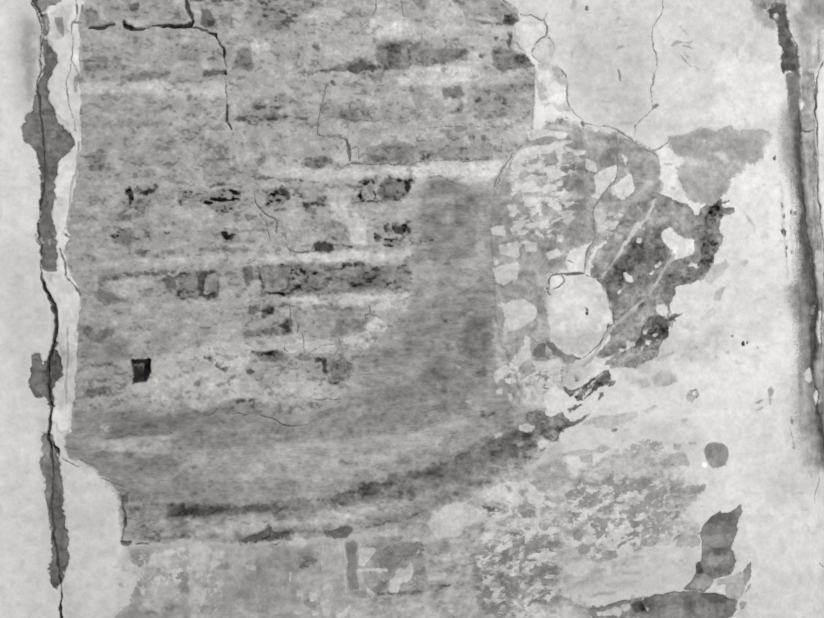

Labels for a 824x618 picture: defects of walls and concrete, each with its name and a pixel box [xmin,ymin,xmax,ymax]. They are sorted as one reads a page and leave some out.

crack [65,0,232,132]
crack [503,0,555,65]
leakage [749,0,777,32]
flaking render [21,39,75,273]
crack [30,0,156,618]
peeling [490,275,581,414]
crack [546,0,669,357]
leakage [613,338,678,390]
peeling [582,125,773,371]
leakage [772,0,824,477]
flaking render [589,590,738,618]
flaking render [684,505,752,600]